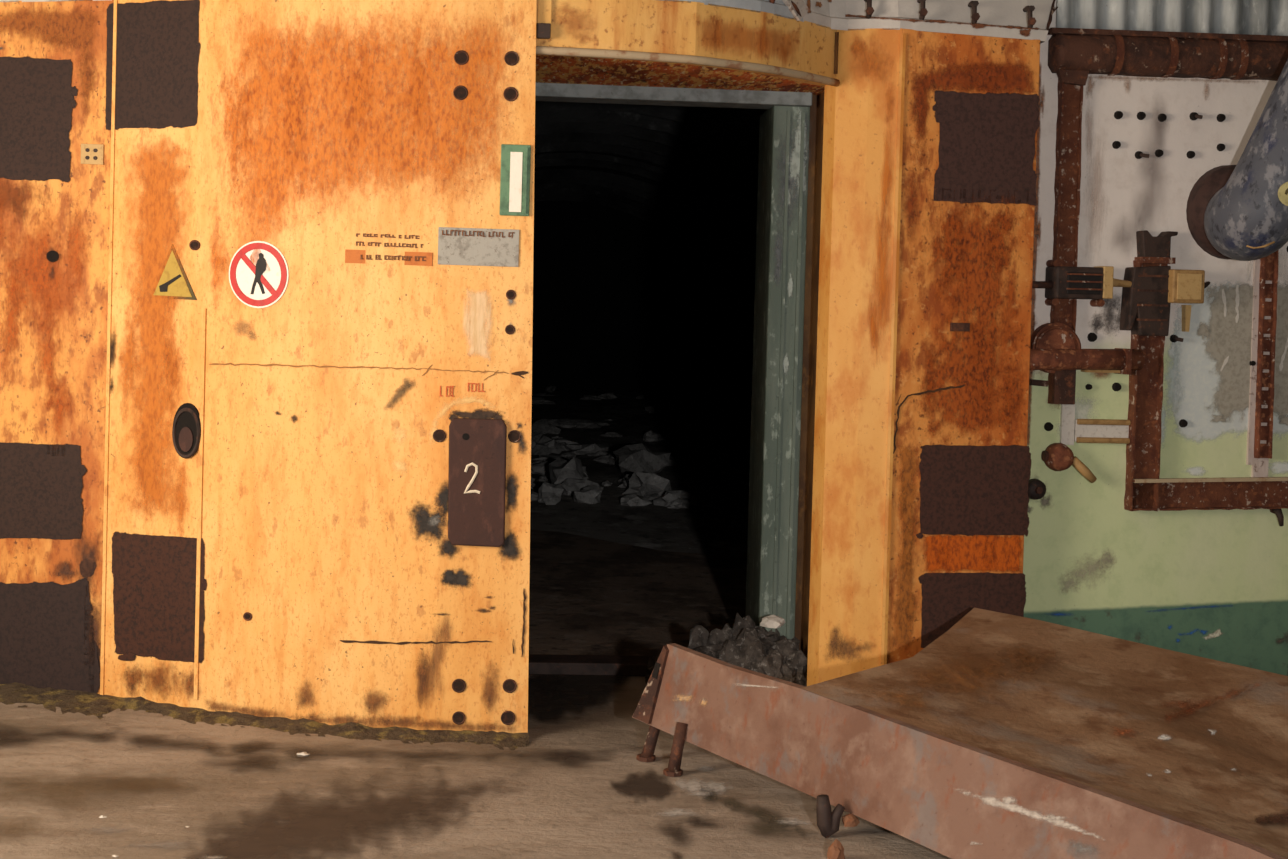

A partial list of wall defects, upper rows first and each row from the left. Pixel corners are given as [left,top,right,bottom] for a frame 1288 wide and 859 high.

corrosion [225,25,504,264]
corrosion [912,63,1044,445]
corrosion [119,142,185,520]
peeling [1161,283,1253,442]
spalling [1273,284,1288,437]
corrosion [891,447,1021,646]
water stain [0,729,110,745]
corrosion [126,669,194,695]
water stain [132,736,217,751]
water stain [228,743,277,768]
water stain [191,782,484,859]
water stain [612,767,806,859]